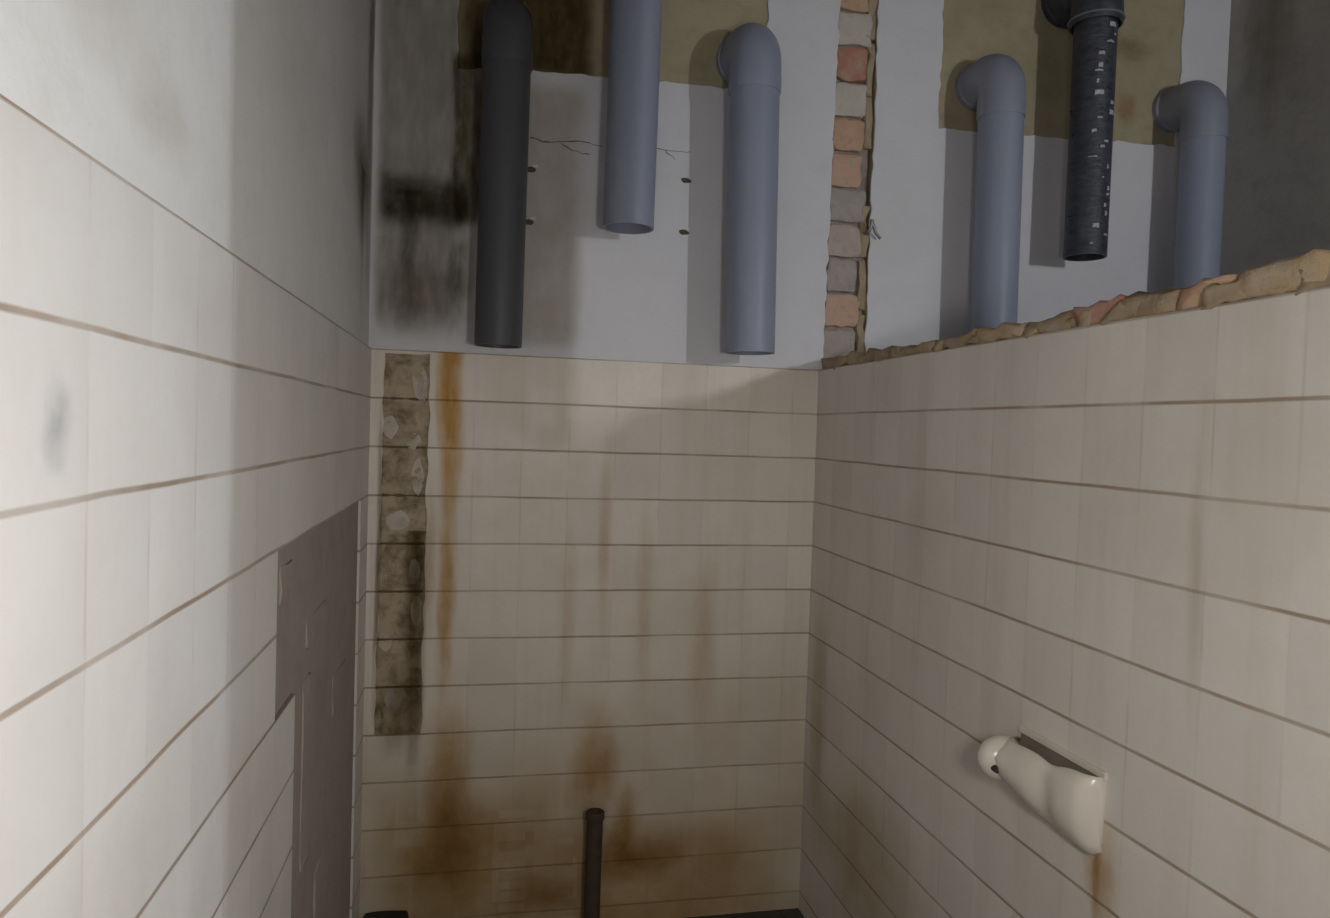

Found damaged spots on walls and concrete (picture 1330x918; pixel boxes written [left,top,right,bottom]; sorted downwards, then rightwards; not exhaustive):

leakage [386,62,482,220]
flaking render [821,0,1330,370]
spalling [374,353,430,735]